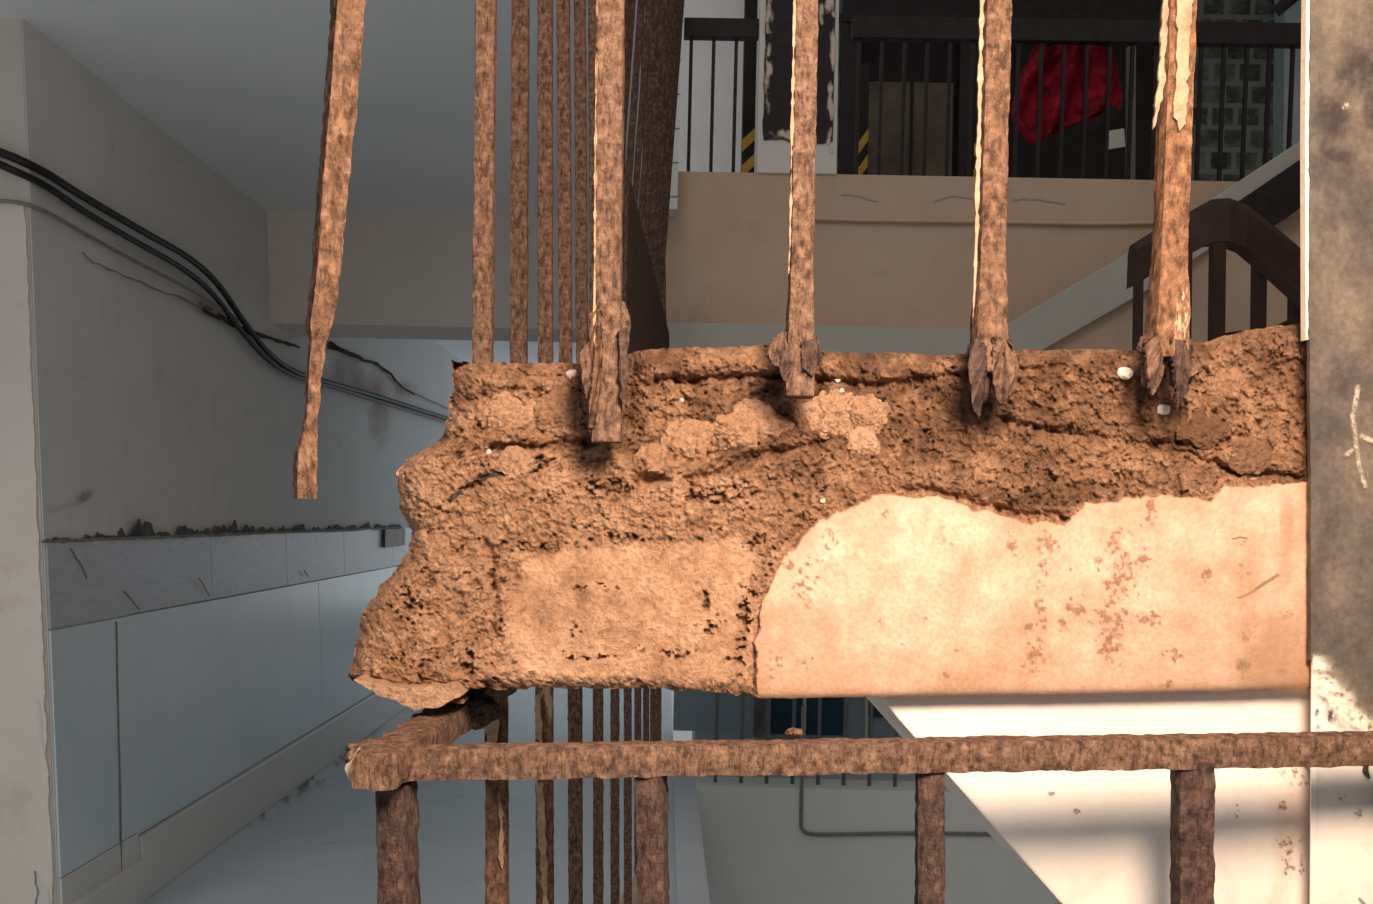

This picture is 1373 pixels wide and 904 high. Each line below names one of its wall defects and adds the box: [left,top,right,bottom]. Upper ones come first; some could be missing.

crack [82,252,448,409]
corrosion [580,308,630,433]
corrosion [767,330,820,382]
corrosion [967,334,1020,420]
corrosion [1142,334,1200,406]
spalling [42,323,1308,710]
corrosion [345,748,361,780]